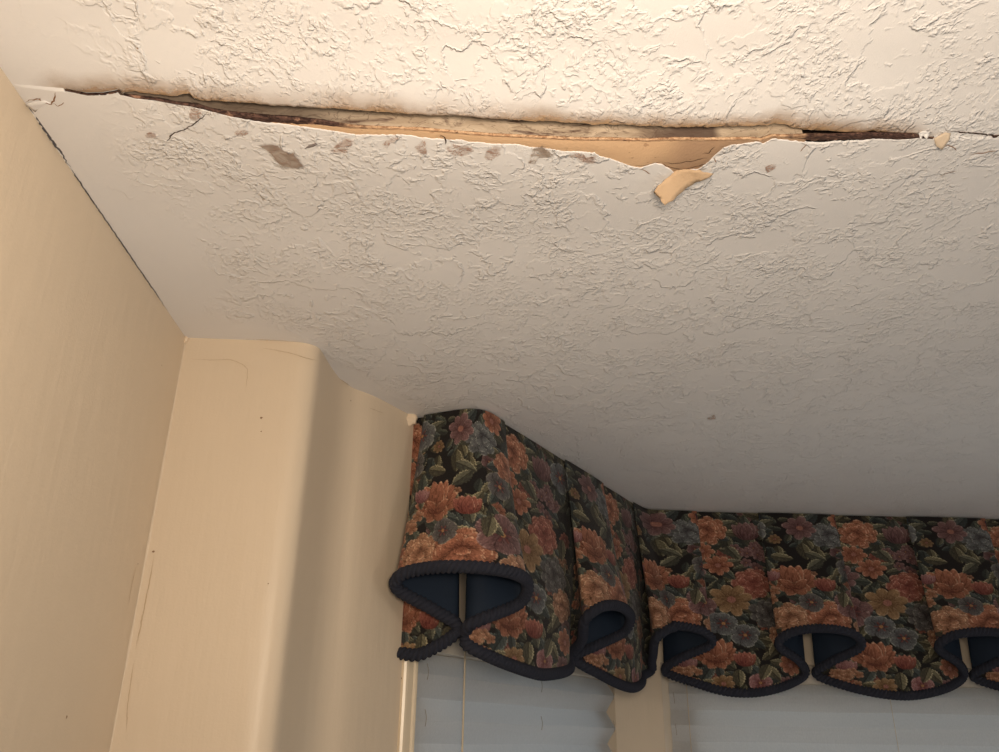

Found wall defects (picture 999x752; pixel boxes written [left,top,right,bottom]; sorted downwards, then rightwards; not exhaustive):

spalling [261,145,303,169]
crack [28,89,999,304]